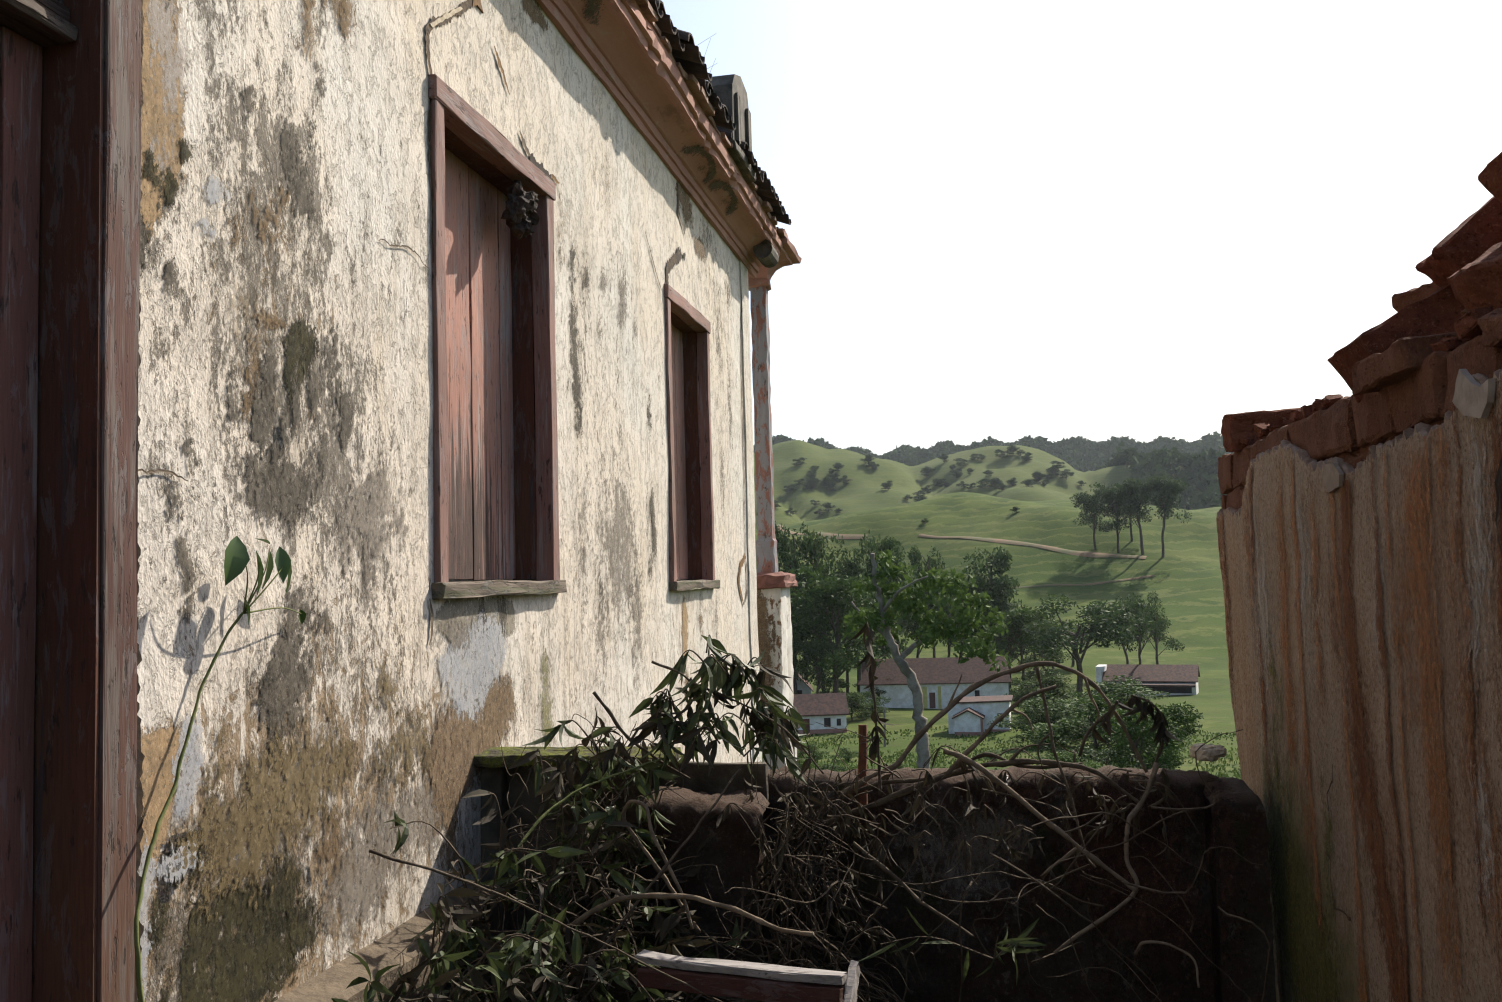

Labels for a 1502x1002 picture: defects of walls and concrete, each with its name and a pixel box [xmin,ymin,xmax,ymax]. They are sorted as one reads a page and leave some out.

mould [142,137,194,208]
spalling [140,0,231,300]
water stain [228,0,359,261]
crack [379,0,510,269]
crack [520,131,560,184]
water stain [148,574,460,1002]
water stain [227,303,411,625]
spalling [419,609,521,848]
rust [757,589,776,710]
rust [1216,515,1234,681]
rust [1327,452,1423,1002]
rust [1450,402,1487,937]